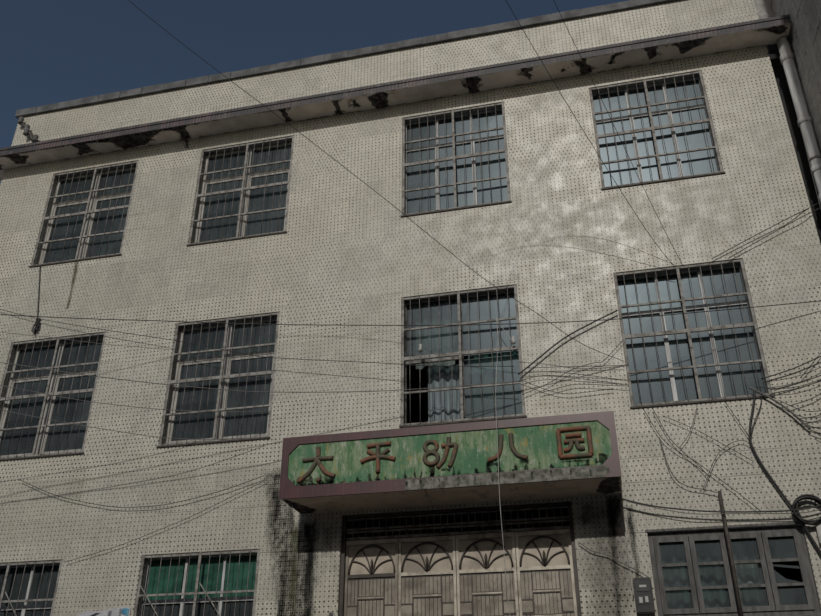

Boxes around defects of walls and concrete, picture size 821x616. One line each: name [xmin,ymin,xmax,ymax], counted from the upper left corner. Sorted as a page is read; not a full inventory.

peeling [757,25,788,35]
peeling [644,37,712,60]
peeling [561,58,594,75]
peeling [462,77,482,93]
peeling [332,99,360,115]
peeling [368,92,390,109]
peeling [99,125,192,149]
peeling [71,142,97,155]
peeling [0,154,28,170]
leakage [607,498,619,569]
leakage [267,475,316,616]